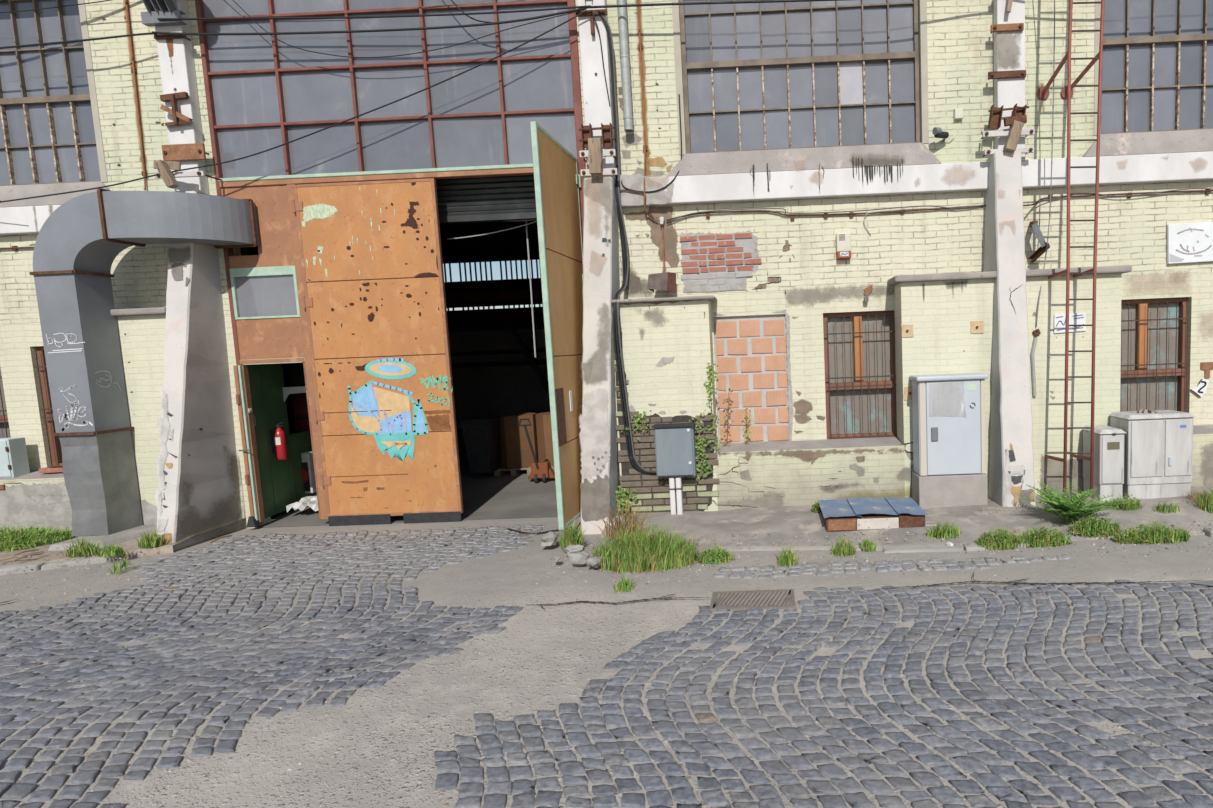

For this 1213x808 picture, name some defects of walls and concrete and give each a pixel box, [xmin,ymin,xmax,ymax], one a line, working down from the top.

corrosion [636,0,650,175]
corrosion [314,282,383,335]
corrosion [400,201,438,318]
peeling [619,133,679,268]
water stain [852,154,903,184]
flaking render [579,300,902,521]